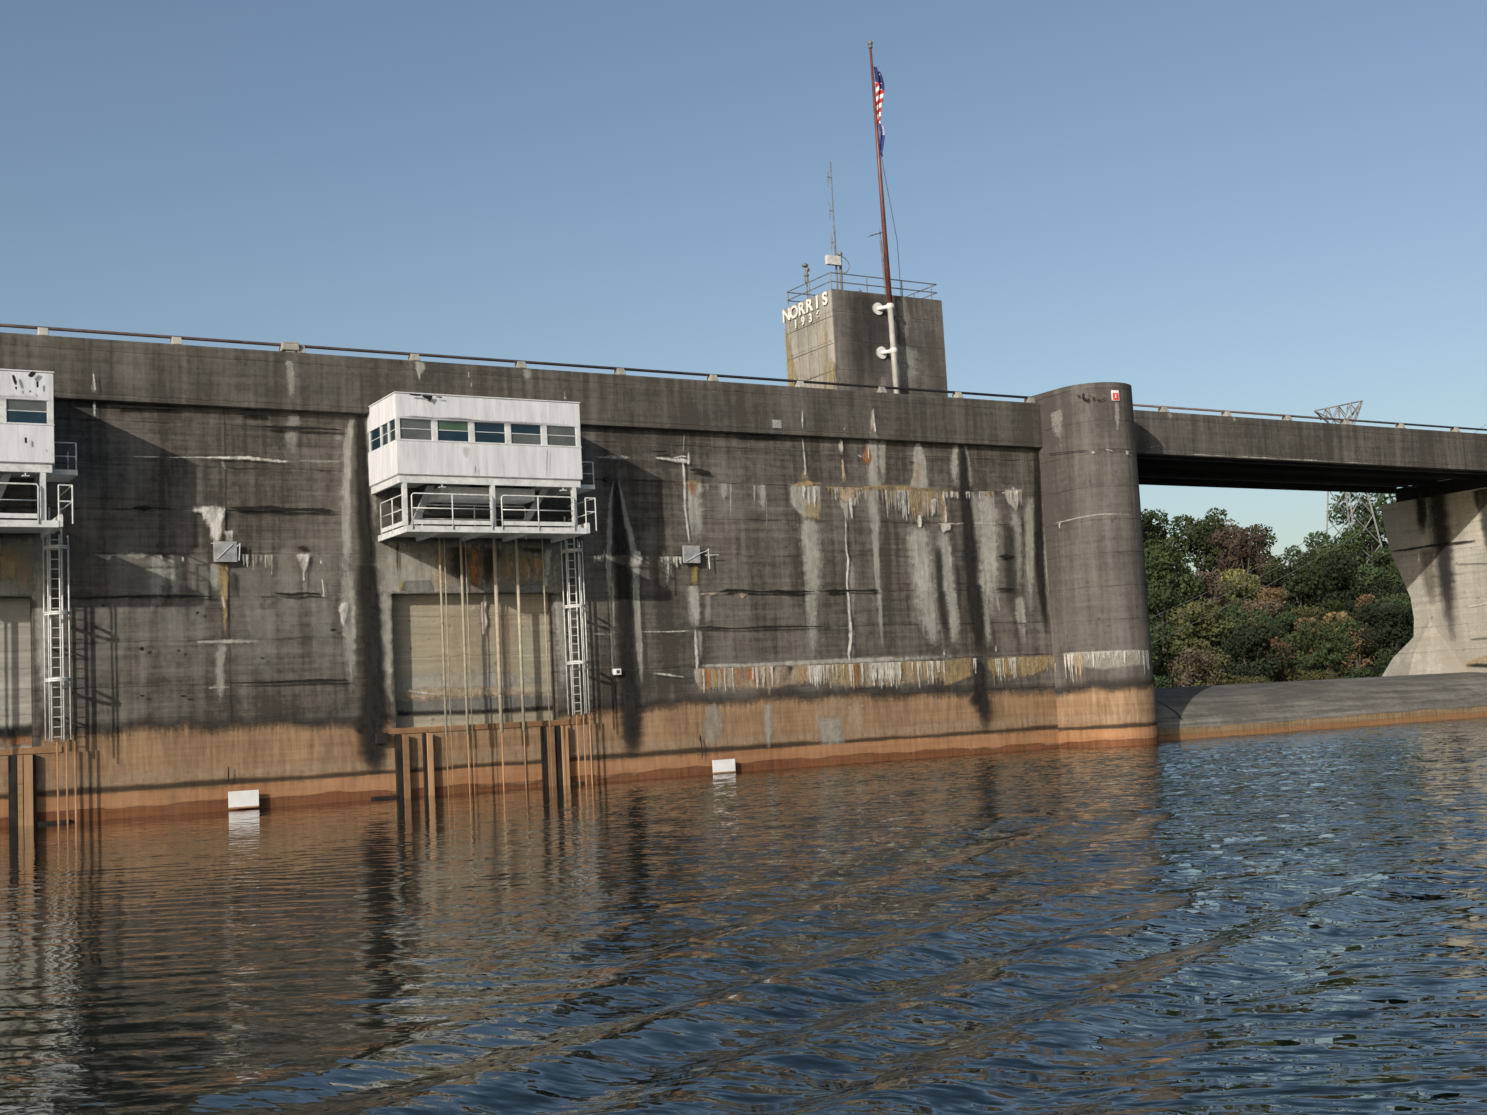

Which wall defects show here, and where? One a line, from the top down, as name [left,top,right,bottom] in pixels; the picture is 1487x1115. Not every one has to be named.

rust [198,564,251,692]
damp [594,409,1149,752]
damp [1416,491,1453,619]
rust [0,658,1487,827]